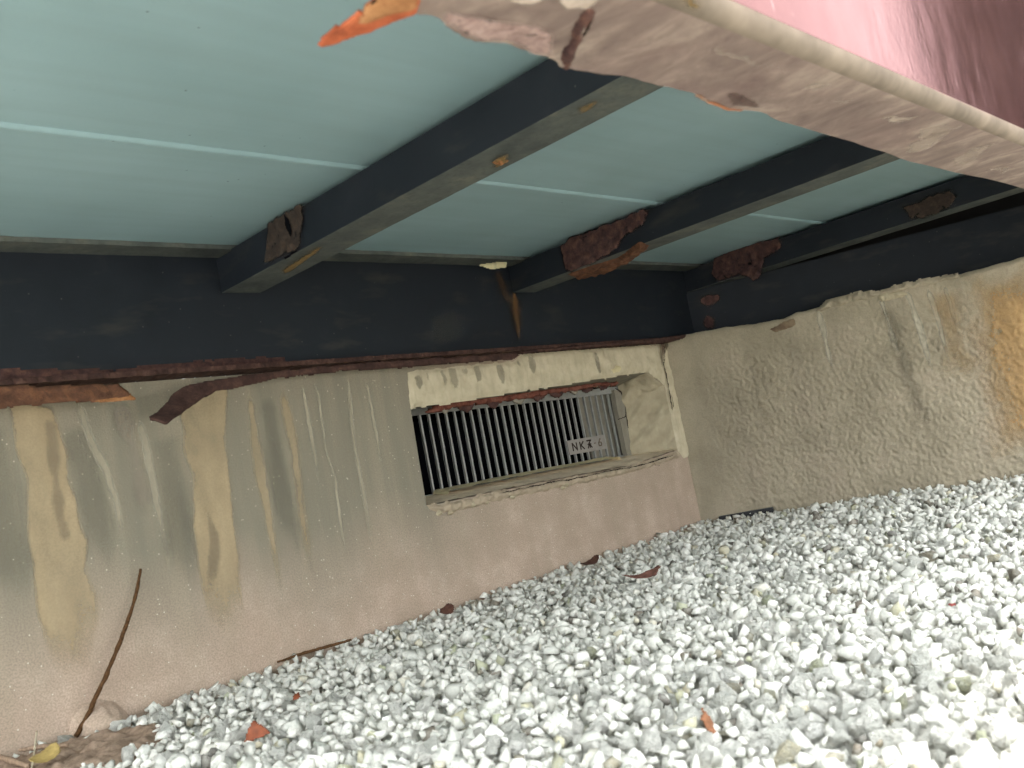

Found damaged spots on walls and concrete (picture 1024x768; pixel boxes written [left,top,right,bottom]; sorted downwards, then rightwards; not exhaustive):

peeling [445,13,552,55]
peeling [560,0,598,9]
peeling [728,93,757,107]
rust [264,204,320,273]
rust [560,209,649,280]
rust [711,237,781,281]
rust [0,383,136,409]
rust [149,334,686,425]
spalling [425,381,618,414]
leakage [10,405,96,650]
leakage [181,390,240,606]
leakage [248,401,276,556]